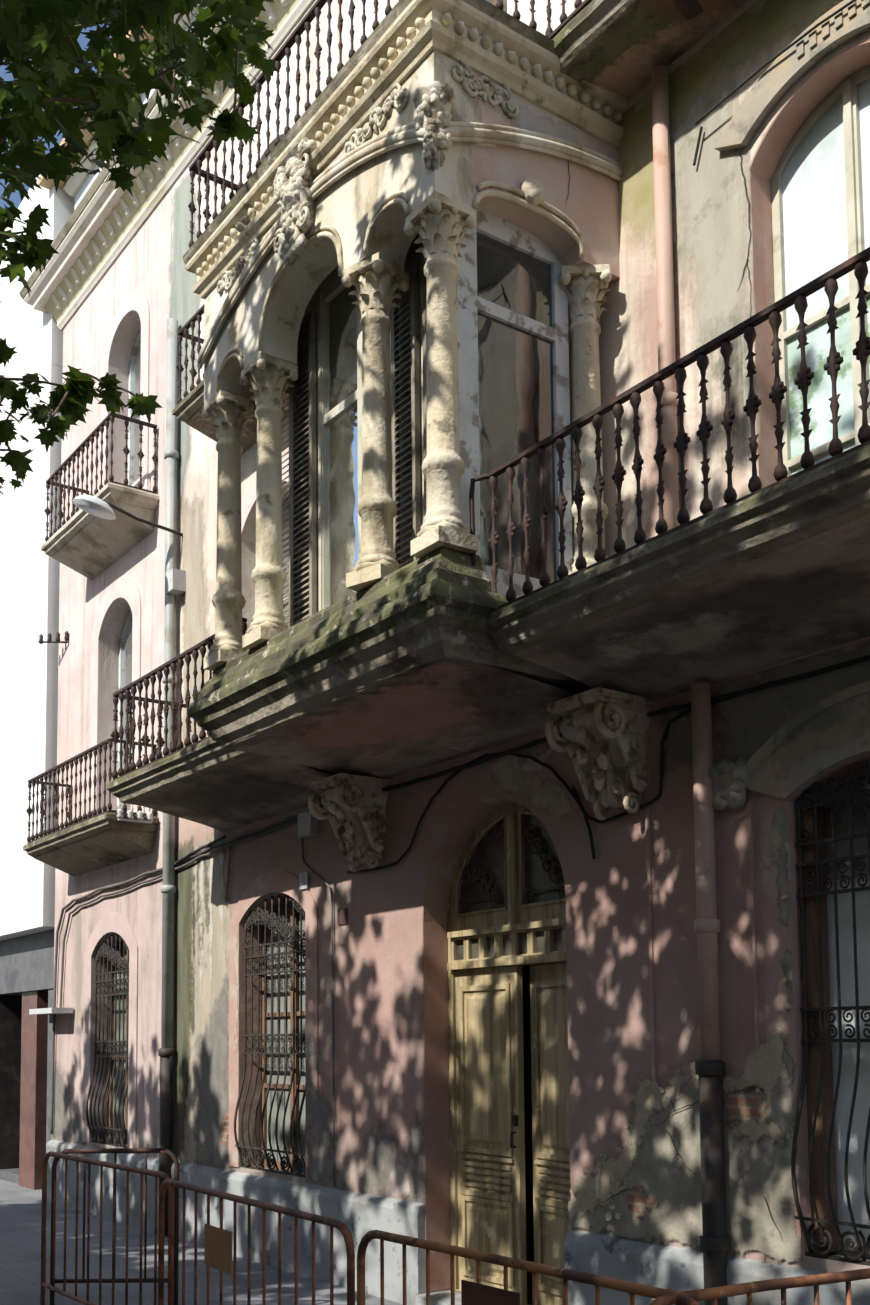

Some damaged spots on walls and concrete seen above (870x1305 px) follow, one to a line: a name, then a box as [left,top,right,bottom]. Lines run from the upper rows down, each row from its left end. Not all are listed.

damp [573,0,684,91]
crack [737,152,752,317]
damp [594,613,744,667]
damp [173,834,231,1168]
flaking render [568,1060,703,1248]
crack [650,1097,699,1175]
flaking render [722,1025,801,1264]